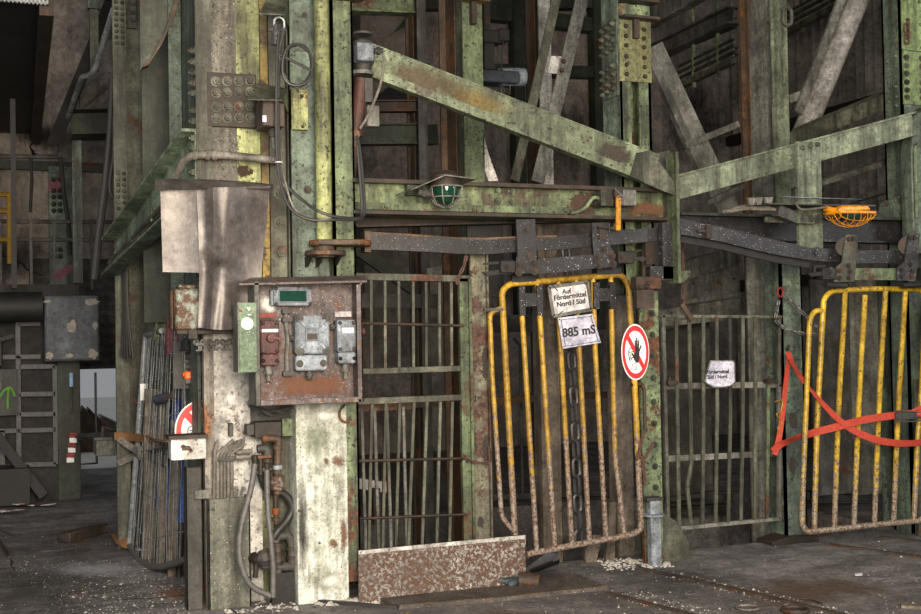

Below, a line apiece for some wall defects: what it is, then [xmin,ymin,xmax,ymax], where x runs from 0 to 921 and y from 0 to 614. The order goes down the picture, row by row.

rust [397,0,460,97]
rust [744,0,752,156]
rust [447,109,458,173]
rust [600,144,630,163]
rust [271,374,347,399]
rust [449,254,462,541]
rust [329,521,347,550]